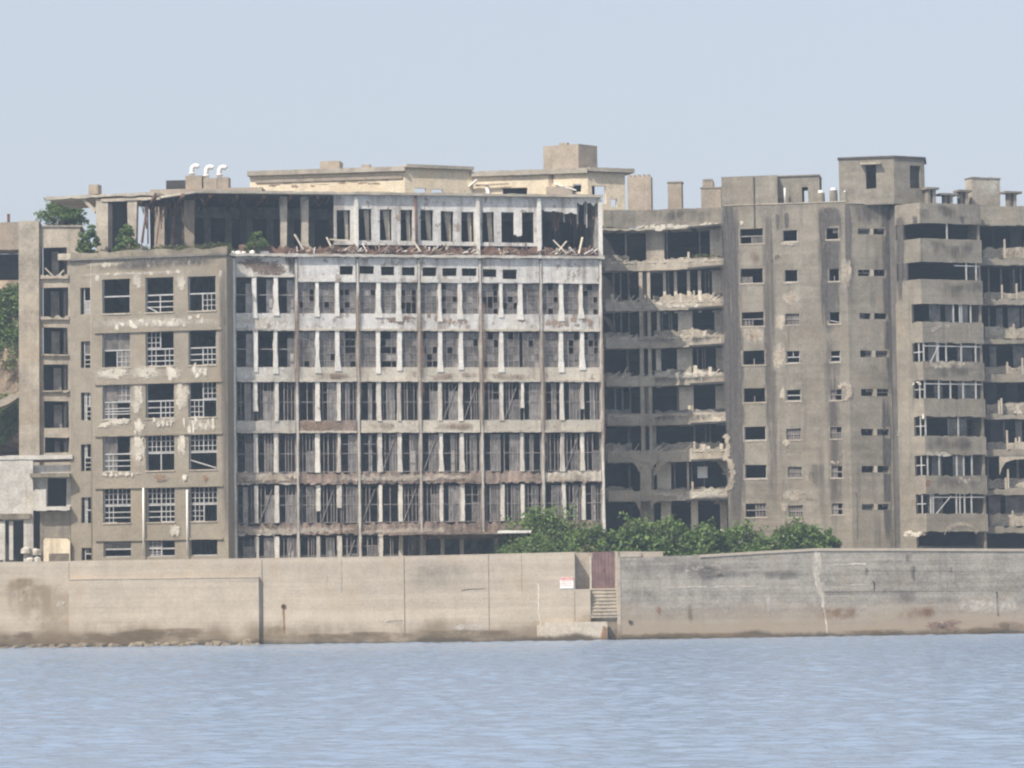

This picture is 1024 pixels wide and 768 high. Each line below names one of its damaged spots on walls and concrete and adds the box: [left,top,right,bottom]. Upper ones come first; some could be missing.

peeling [98,365,215,461]
spalling [653,434,736,514]
crack [814,551,964,633]